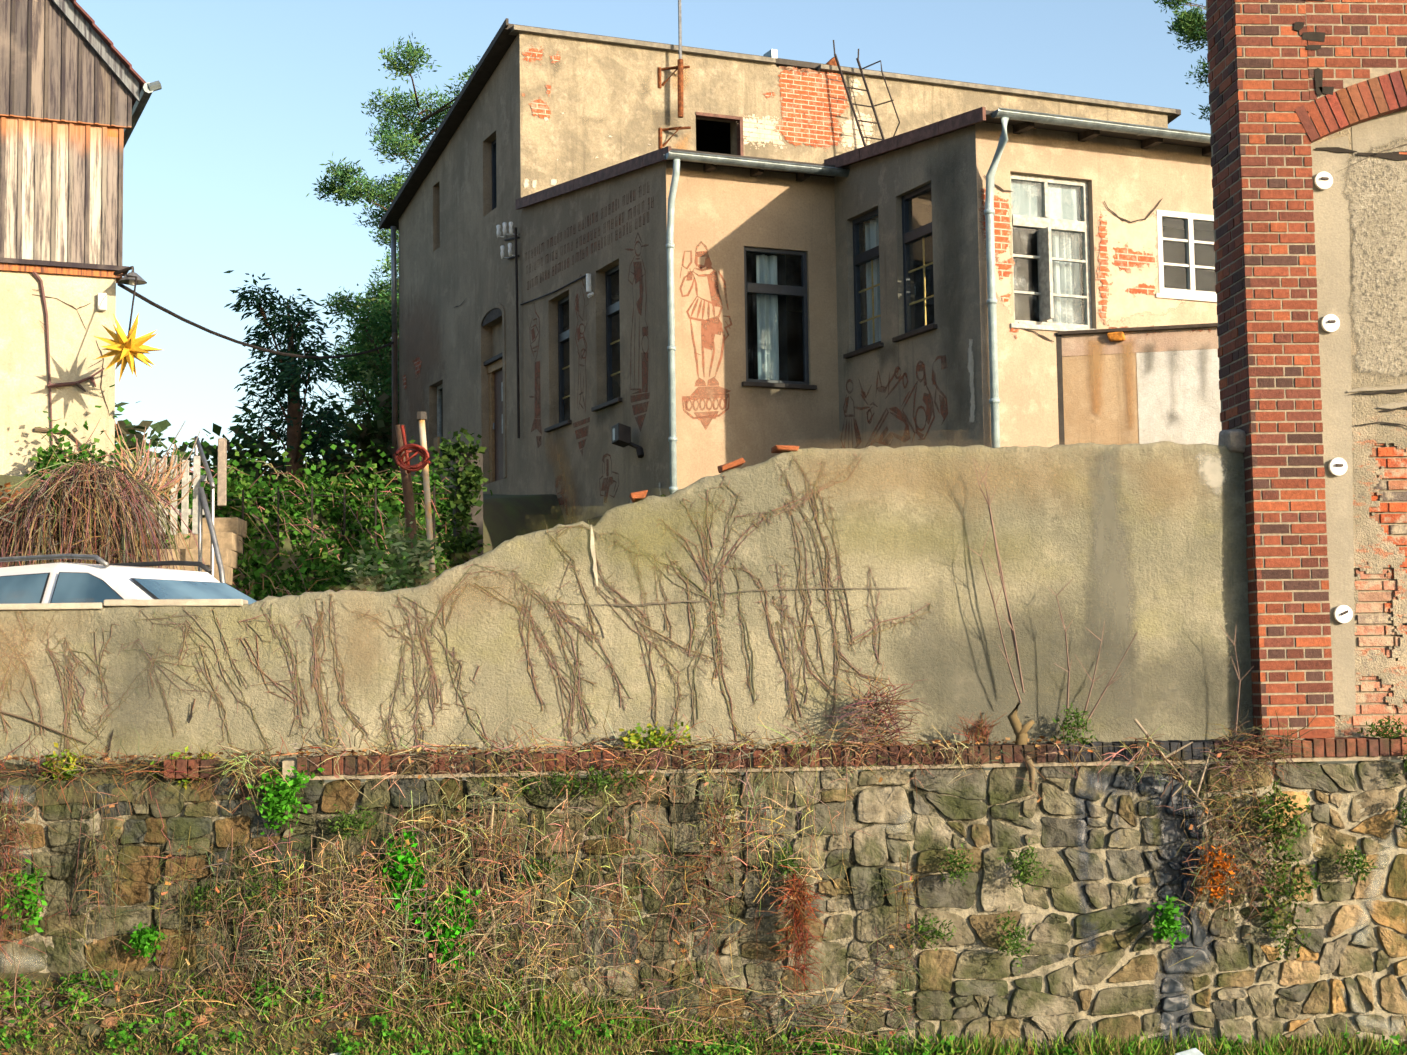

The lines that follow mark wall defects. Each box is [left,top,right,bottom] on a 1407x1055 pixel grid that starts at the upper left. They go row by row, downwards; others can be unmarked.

flaking render [522,46,561,65]
flaking render [522,85,564,121]
flaking render [763,67,875,151]
crack [1315,144,1407,172]
flaking render [979,188,1020,339]
flaking render [1095,210,1186,335]
crack [1347,384,1407,427]
spalling [1354,443,1407,657]
spalling [1335,676,1407,736]
water stain [1074,772,1217,1042]